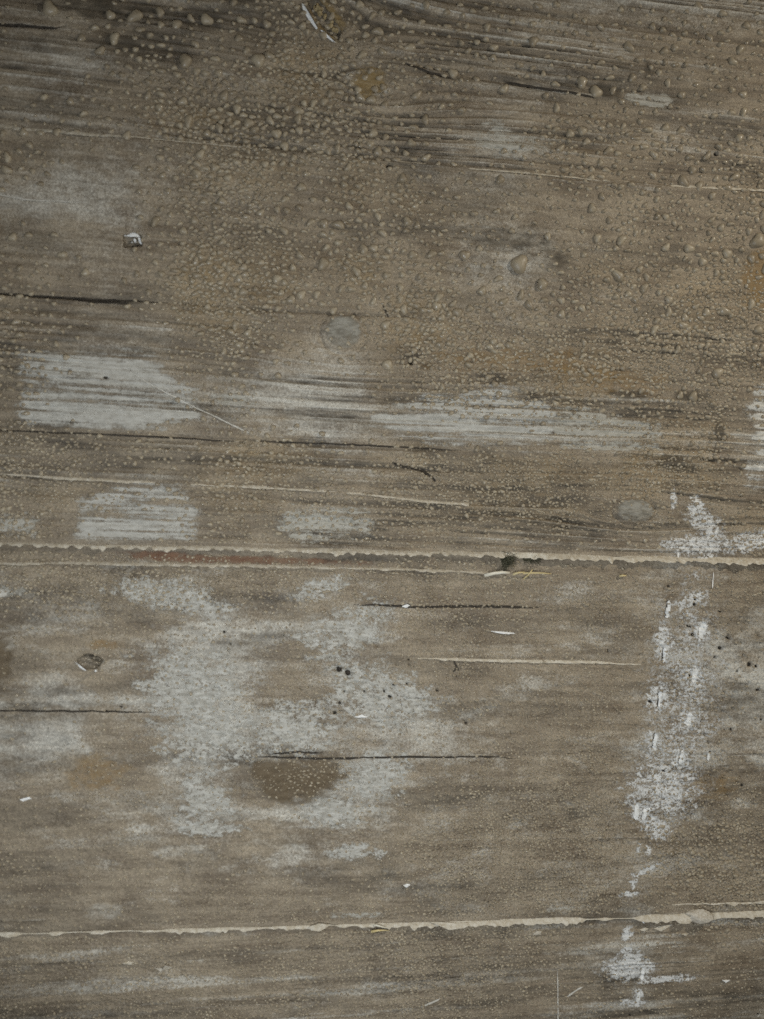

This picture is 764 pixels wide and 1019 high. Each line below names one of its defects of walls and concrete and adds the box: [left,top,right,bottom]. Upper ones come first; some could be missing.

water stain [660,489,764,558]
water stain [618,572,723,896]
peeling [309,923,331,931]
peeling [431,922,473,930]
spalling [640,909,715,931]
water stain [602,926,696,1007]